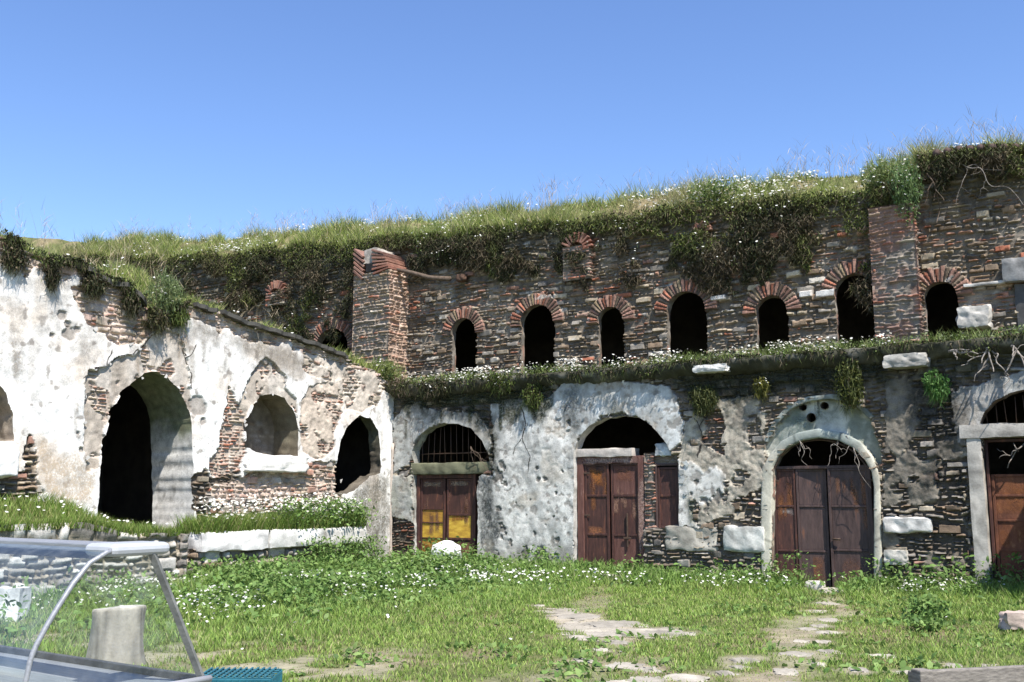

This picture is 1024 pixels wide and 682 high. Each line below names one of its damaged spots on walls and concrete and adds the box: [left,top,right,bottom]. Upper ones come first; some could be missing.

peeling [49,286,207,472]
spalling [22,434,38,475]
spalling [209,353,383,478]
hole [493,460,508,487]
spalling [679,461,724,516]
spalling [701,409,726,455]
hole [495,505,555,563]